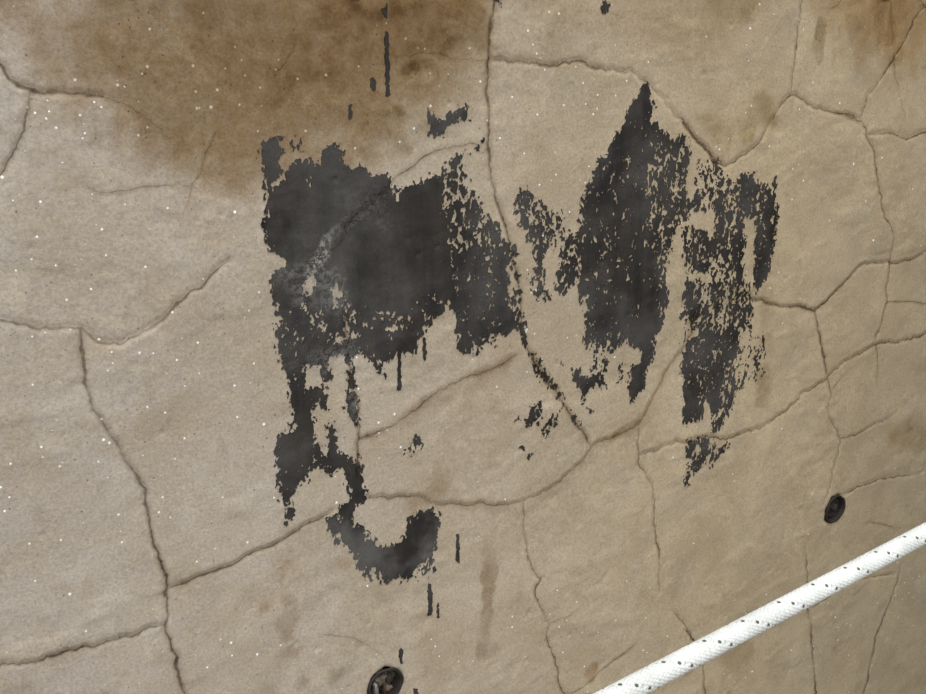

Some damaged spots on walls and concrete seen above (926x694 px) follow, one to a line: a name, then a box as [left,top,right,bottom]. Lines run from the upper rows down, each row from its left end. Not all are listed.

crack [0,64,95,96]
crack [485,0,495,171]
crack [525,60,605,70]
crack [881,6,926,78]
crack [682,121,759,164]
crack [175,267,220,304]
peeling [256,81,780,585]
crack [749,273,853,391]
crack [419,349,589,443]
crack [138,503,320,686]
crack [9,641,106,664]